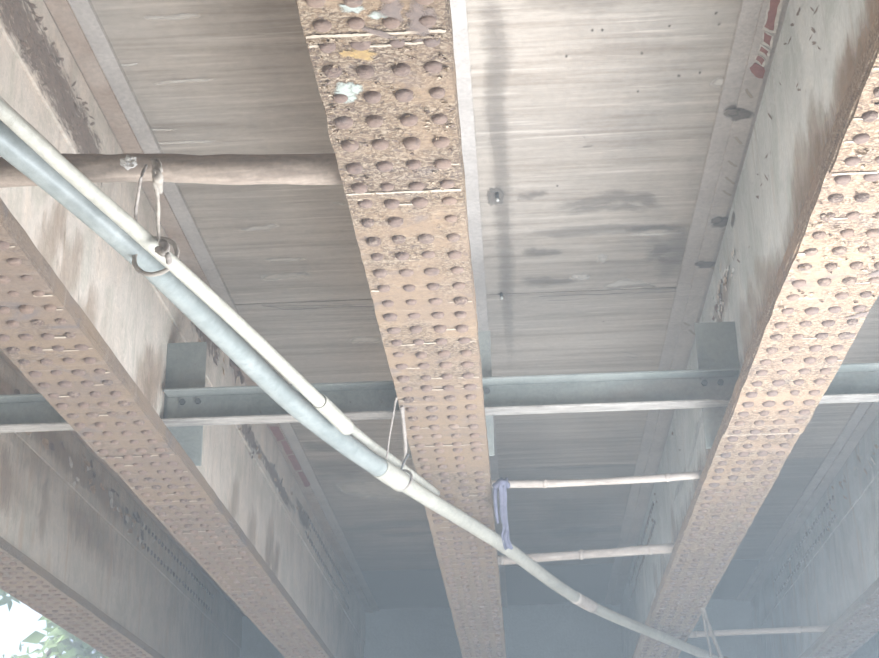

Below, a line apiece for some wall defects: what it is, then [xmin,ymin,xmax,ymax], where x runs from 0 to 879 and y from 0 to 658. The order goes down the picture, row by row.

peeling [750,0,783,78]